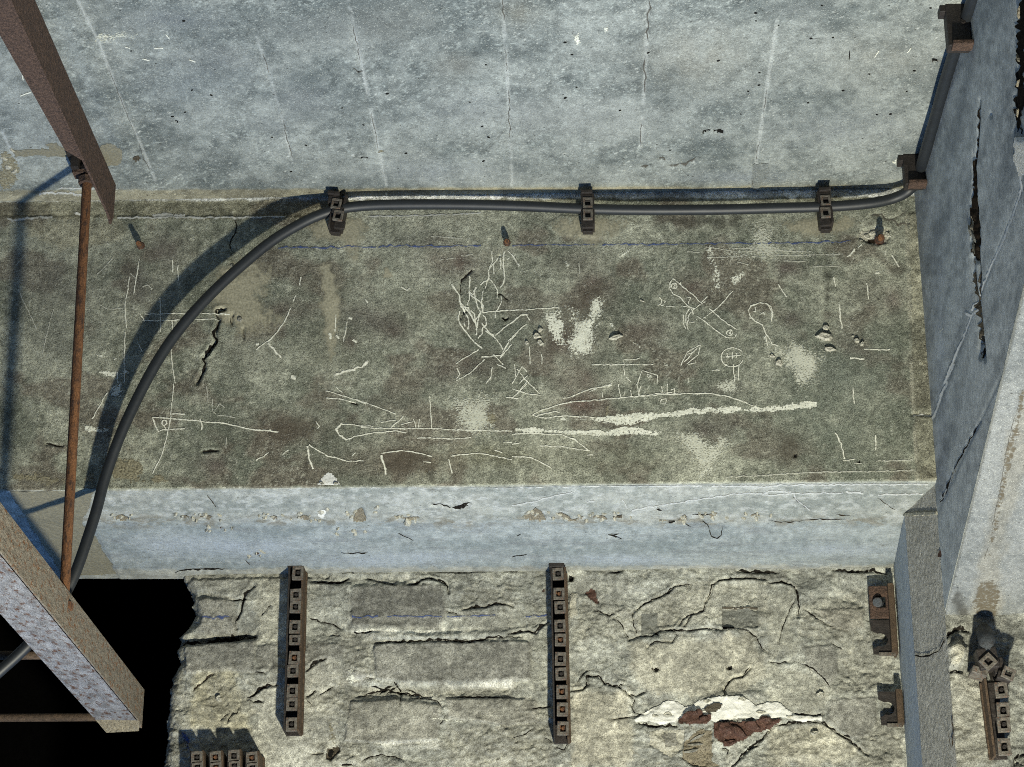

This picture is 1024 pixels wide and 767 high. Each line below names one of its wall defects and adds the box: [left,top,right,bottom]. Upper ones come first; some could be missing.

crack [197,308,245,383]
spalling [335,508,378,536]
spalling [522,508,632,523]
spalling [659,511,728,525]
crack [176,560,271,647]
crack [306,553,545,705]
crack [596,569,842,694]
crack [221,671,277,722]
crack [359,677,568,750]
crack [578,674,677,728]
flaking render [678,703,782,767]
crack [681,713,864,767]